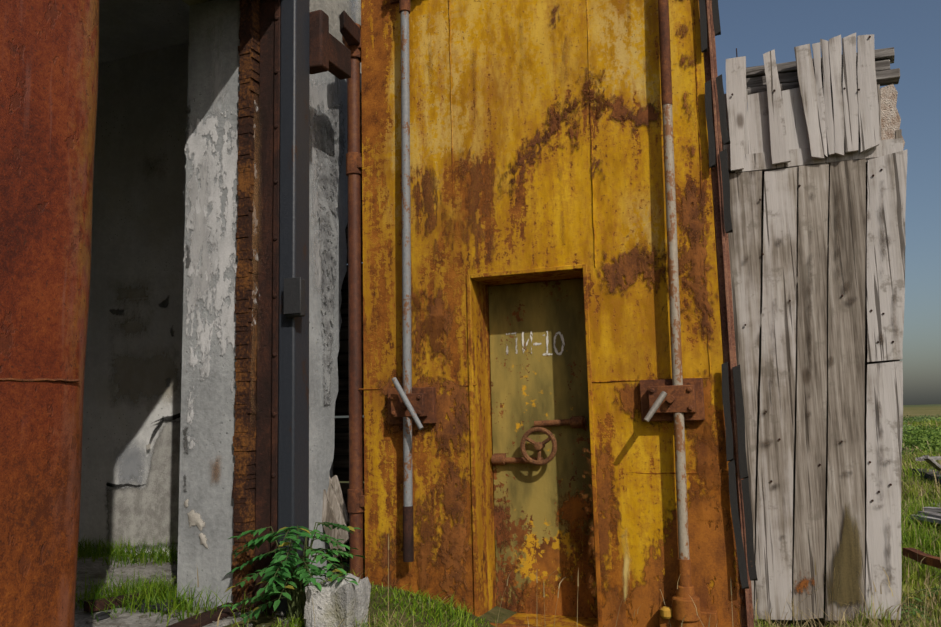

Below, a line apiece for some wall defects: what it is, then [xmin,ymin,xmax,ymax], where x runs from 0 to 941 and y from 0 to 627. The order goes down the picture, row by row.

corrosion [411,67,661,268]
peeling [106,105,239,549]
corrosion [597,185,718,348]
crack [106,481,146,489]
crack [149,413,181,444]
corrosion [494,370,751,627]
damp [828,505,862,607]